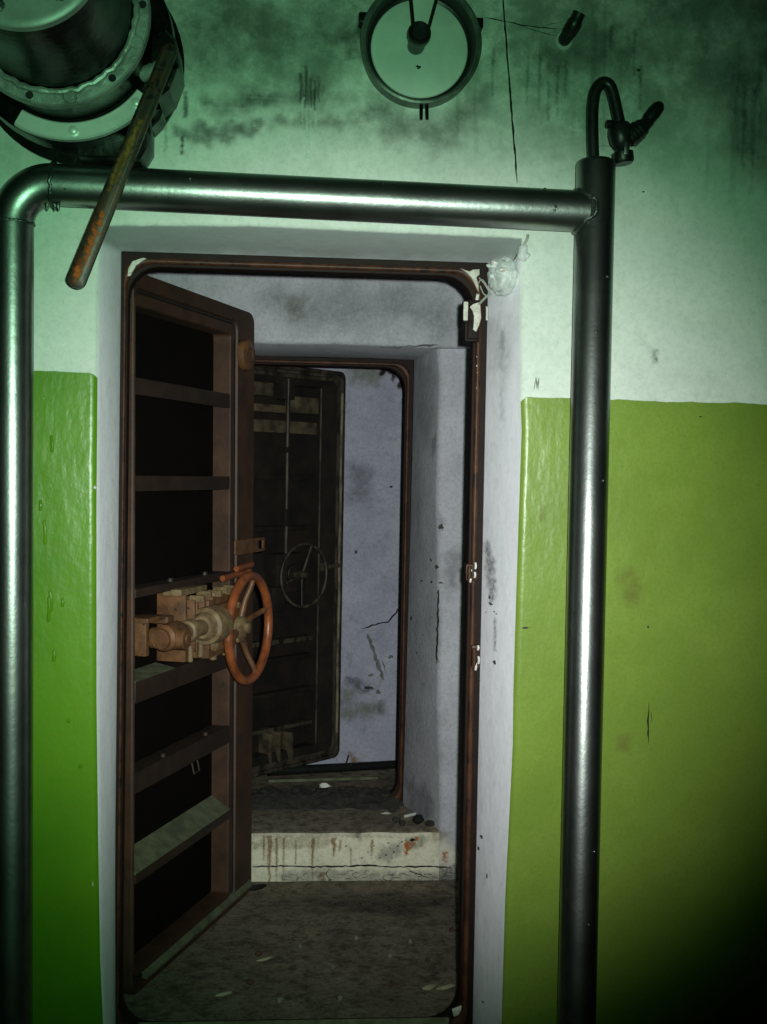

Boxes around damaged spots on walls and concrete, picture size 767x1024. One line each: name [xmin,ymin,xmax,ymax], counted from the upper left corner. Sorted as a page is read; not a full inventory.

crack [484,0,561,179]
crack [363,607,400,629]